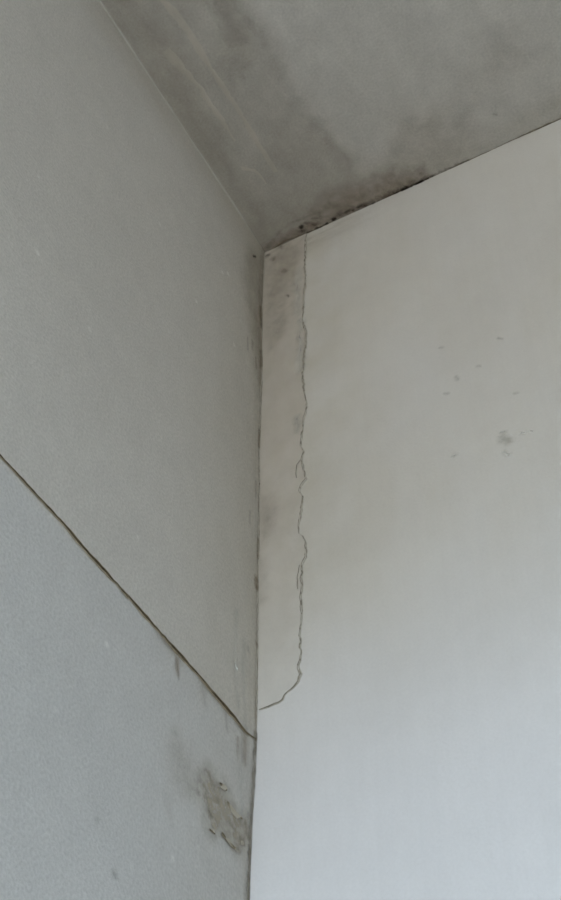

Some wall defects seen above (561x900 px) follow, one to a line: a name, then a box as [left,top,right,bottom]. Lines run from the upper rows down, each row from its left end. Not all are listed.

crack [0,118,561,753]
crack [247,771,255,900]